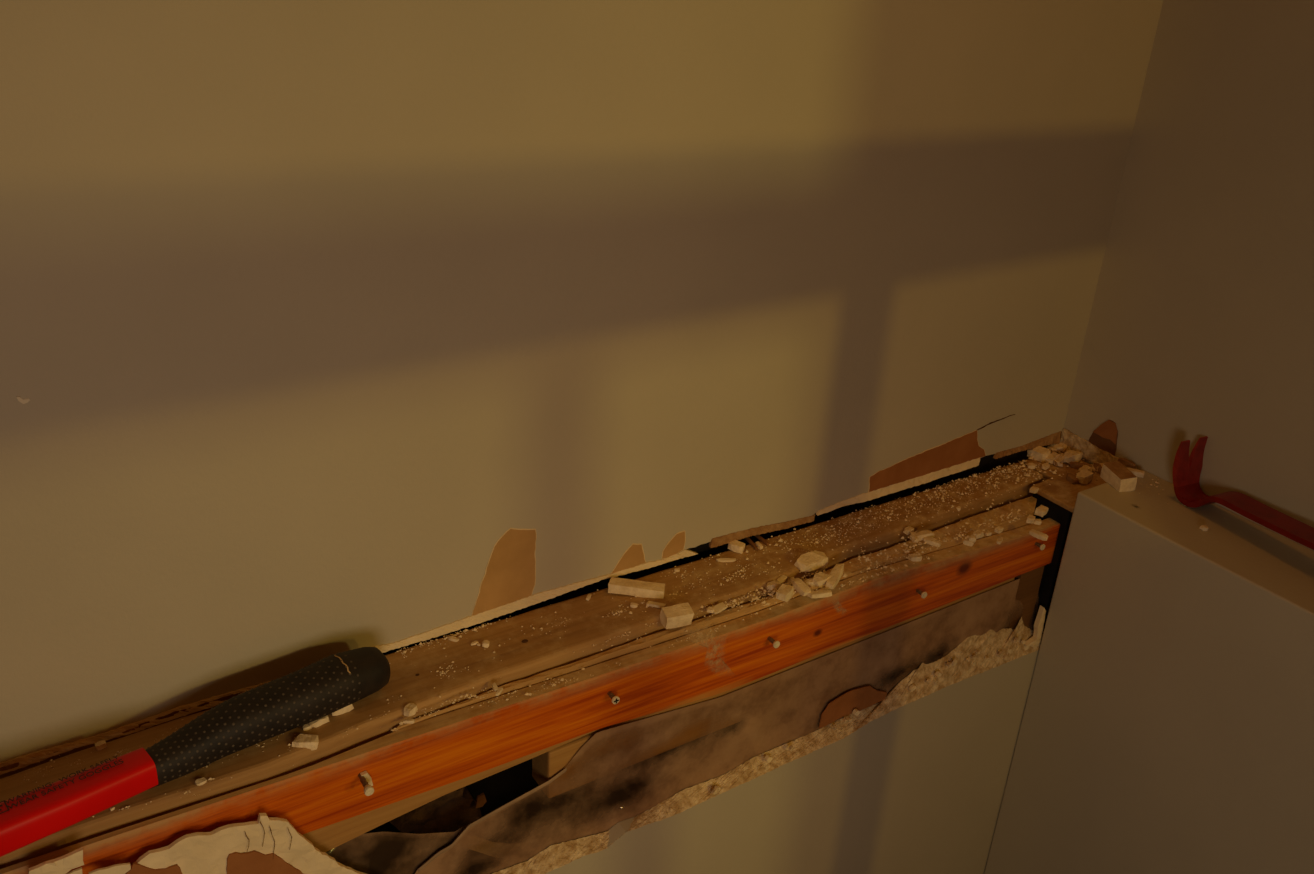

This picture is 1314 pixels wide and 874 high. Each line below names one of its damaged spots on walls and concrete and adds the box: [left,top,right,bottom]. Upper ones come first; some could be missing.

spalling [371,428,1137,653]
spalling [0,681,270,779]
spalling [28,813,366,874]
spalling [492,605,1046,874]